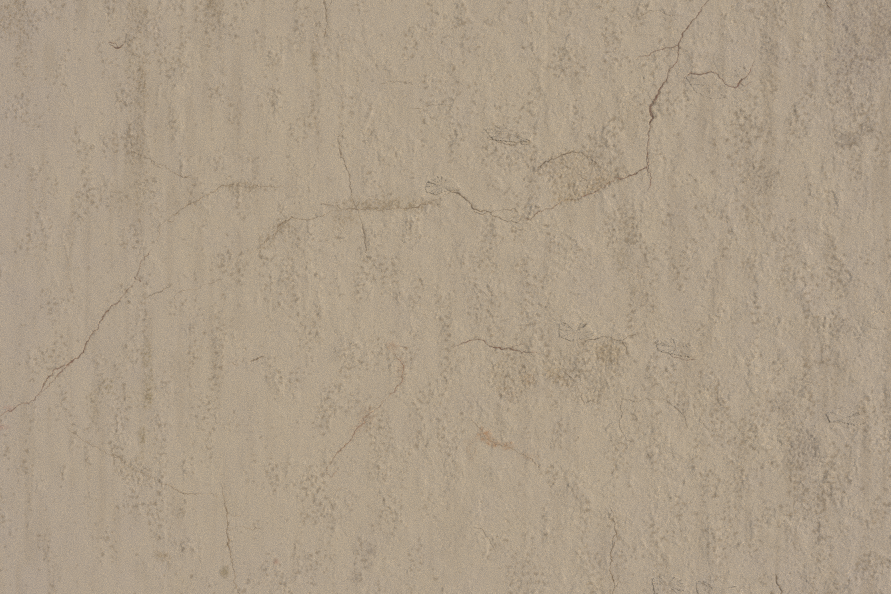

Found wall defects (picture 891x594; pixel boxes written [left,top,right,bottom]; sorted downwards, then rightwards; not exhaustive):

crack [251,0,753,258]
crack [4,184,278,413]
crack [326,345,407,477]
crack [221,484,260,594]